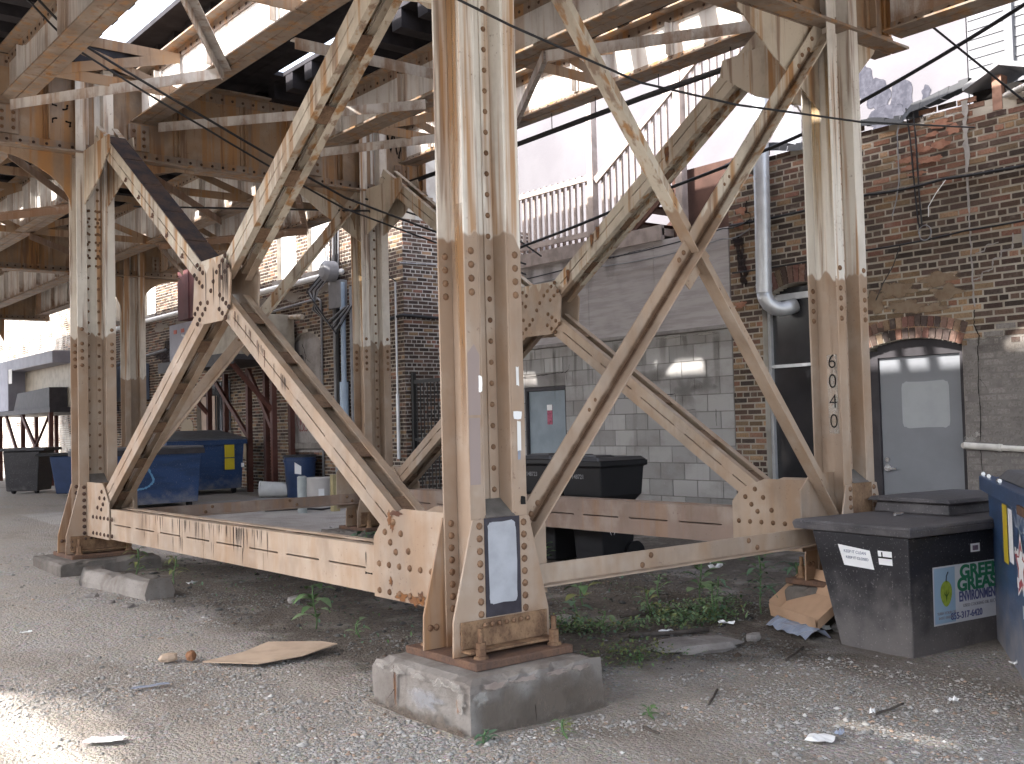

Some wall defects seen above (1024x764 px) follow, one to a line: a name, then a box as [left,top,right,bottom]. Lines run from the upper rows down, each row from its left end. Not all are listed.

crack [973,310,983,472]
rust [387,510,402,532]
rust [389,577,425,606]